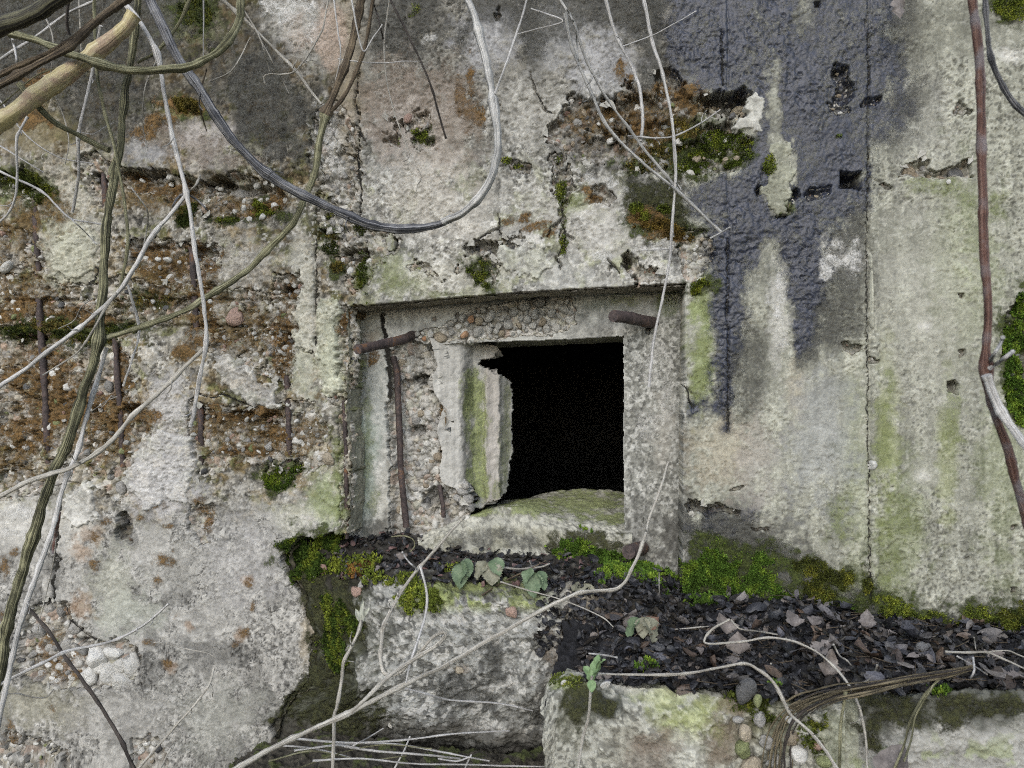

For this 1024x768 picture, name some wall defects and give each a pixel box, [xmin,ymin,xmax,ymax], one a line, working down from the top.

water stain [368,0,924,433]
spalling [542,68,765,253]
spalling [899,150,973,180]
corrosion [0,191,166,477]
peeling [0,101,402,545]
corrosion [122,239,326,469]
corrosion [353,331,416,528]
spalling [387,340,475,535]
corrosion [608,310,659,329]
crack [724,240,732,431]
crack [864,31,872,600]
spalling [13,596,142,693]